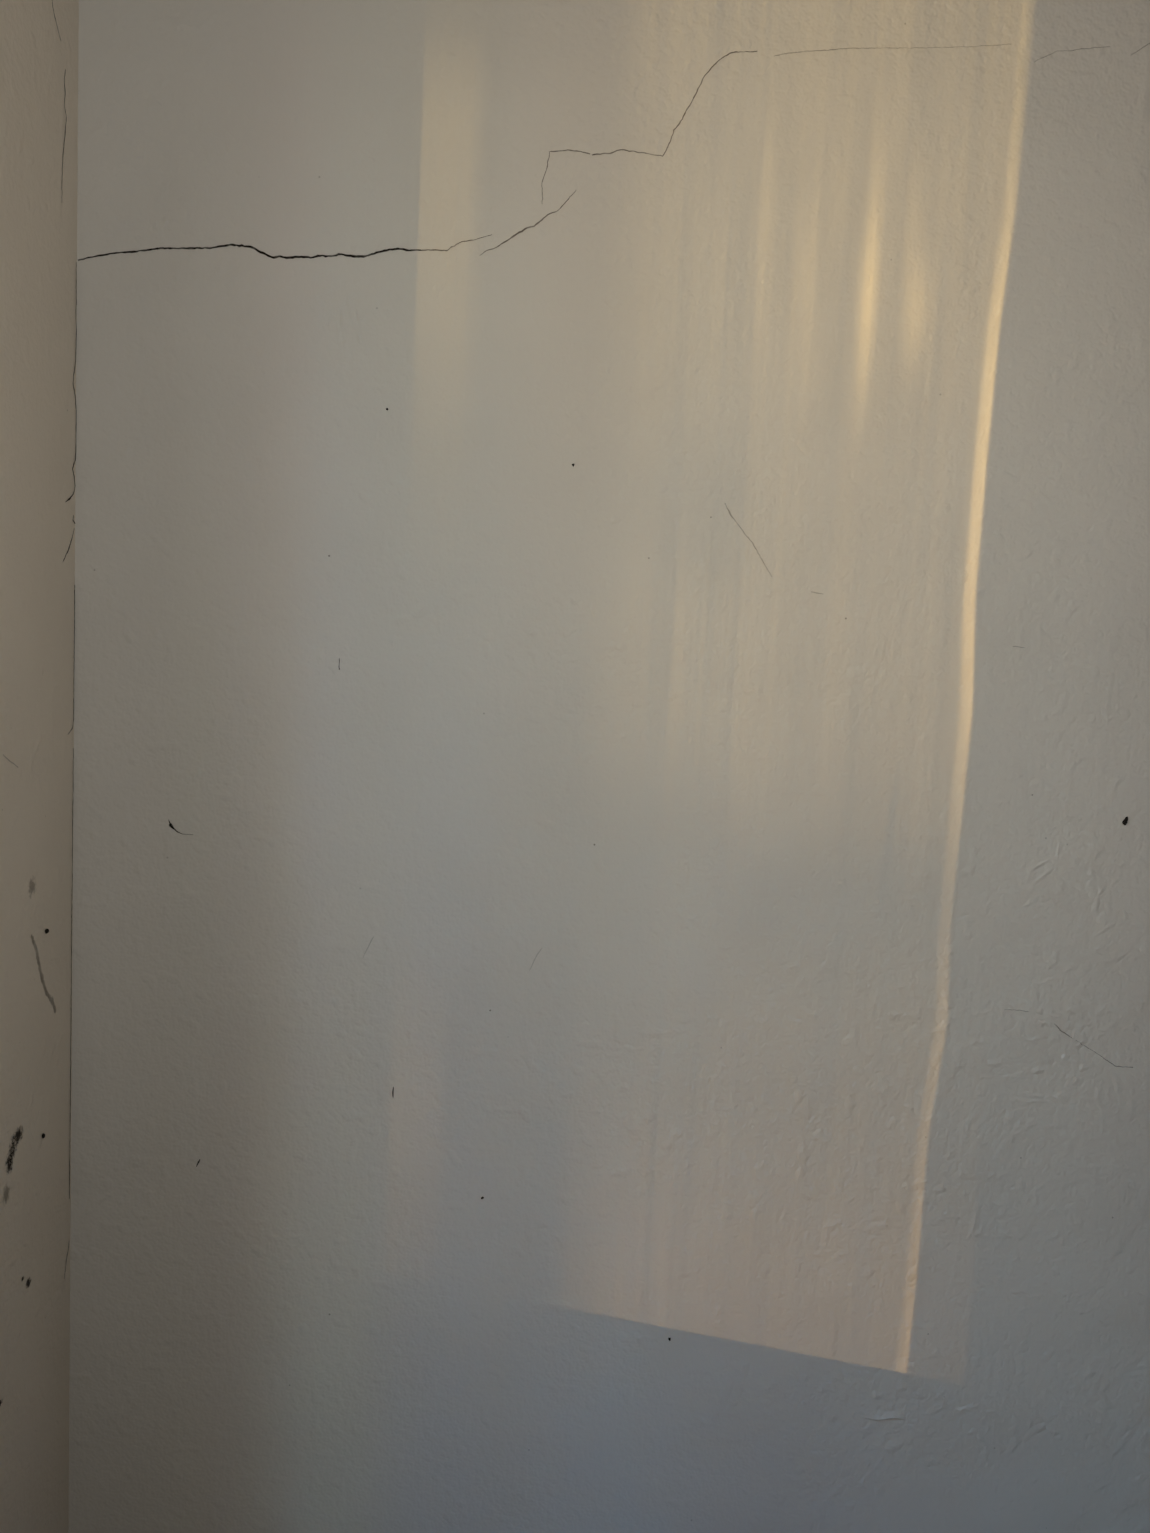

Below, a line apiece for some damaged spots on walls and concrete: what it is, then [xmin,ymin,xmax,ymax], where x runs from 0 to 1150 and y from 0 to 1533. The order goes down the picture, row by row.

crack [73,51,757,415]